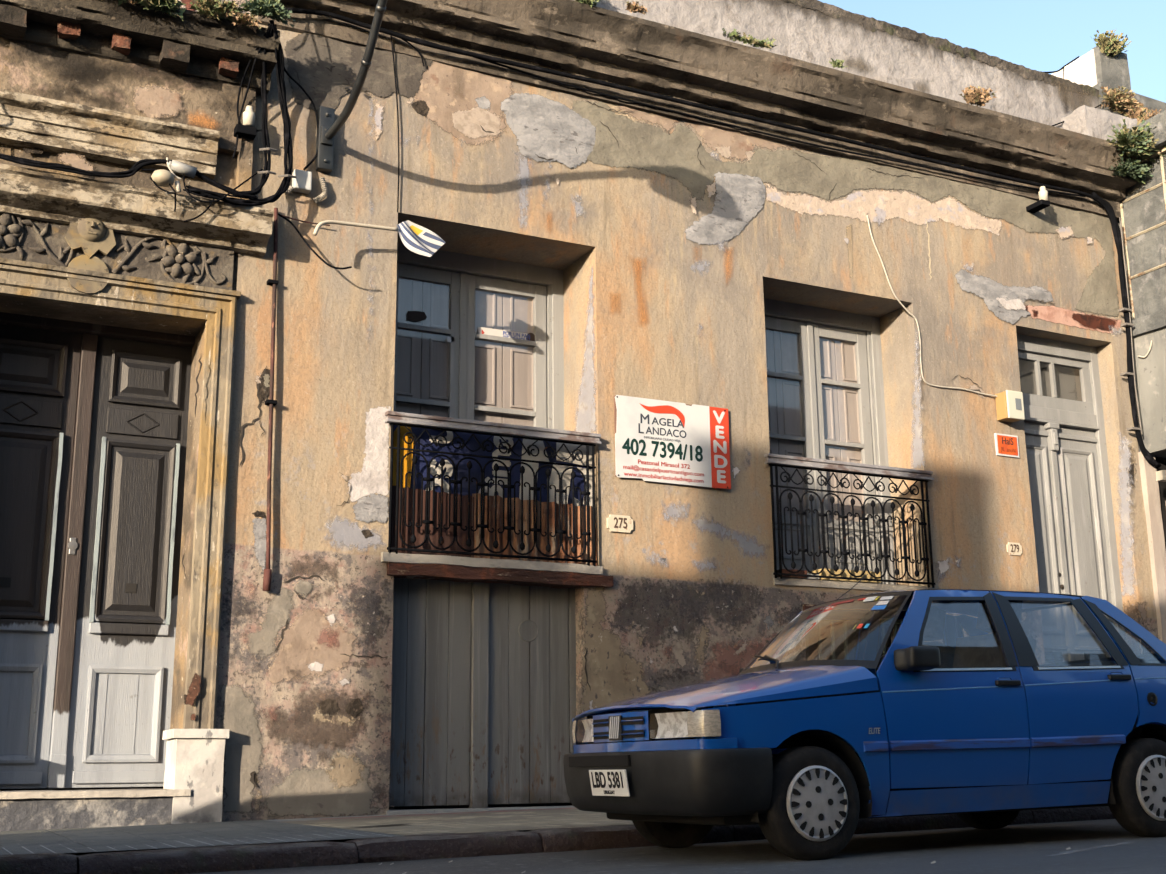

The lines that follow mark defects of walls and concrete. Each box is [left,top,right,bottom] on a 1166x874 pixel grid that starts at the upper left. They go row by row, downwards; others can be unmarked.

flaking render [407,61,513,146]
peeling [690,182,716,214]
peeling [766,184,1002,236]
peeling [996,297,1026,310]
flaking render [325,406,391,551]
spalling [252,511,267,570]
flaking render [226,556,389,686]
spalling [313,698,363,726]